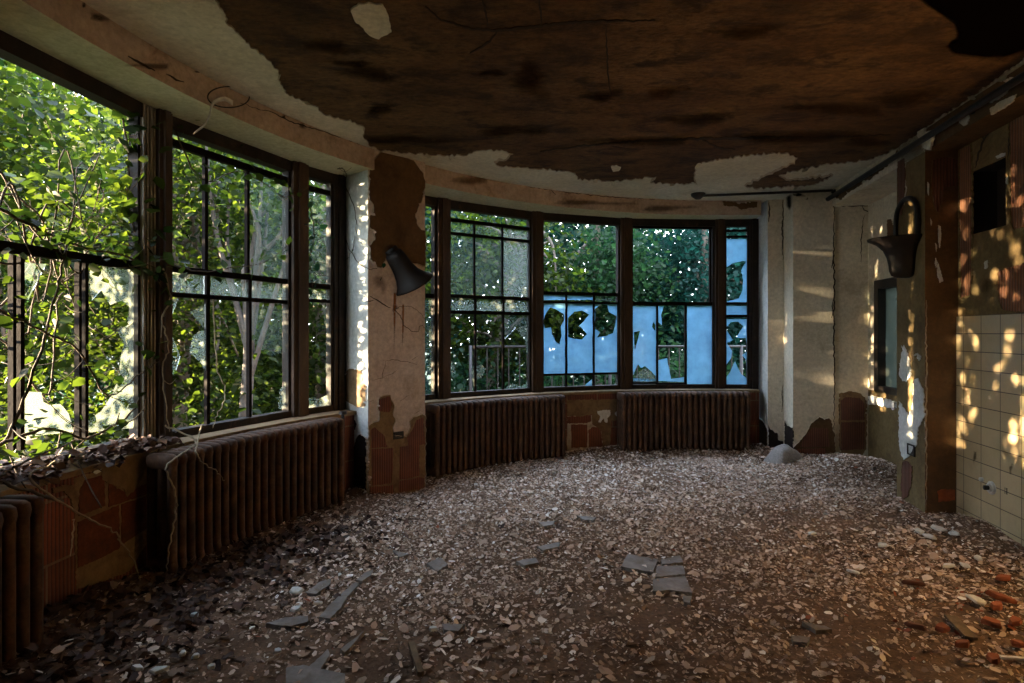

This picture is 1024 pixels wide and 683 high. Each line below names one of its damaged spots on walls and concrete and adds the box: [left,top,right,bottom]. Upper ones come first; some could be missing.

peeling [215,0,1024,269]
peeling [930,218,943,283]
spalling [958,144,1024,313]
spalling [345,368,427,494]
spalling [567,410,617,451]
spalling [759,345,926,500]
spalling [74,472,147,590]